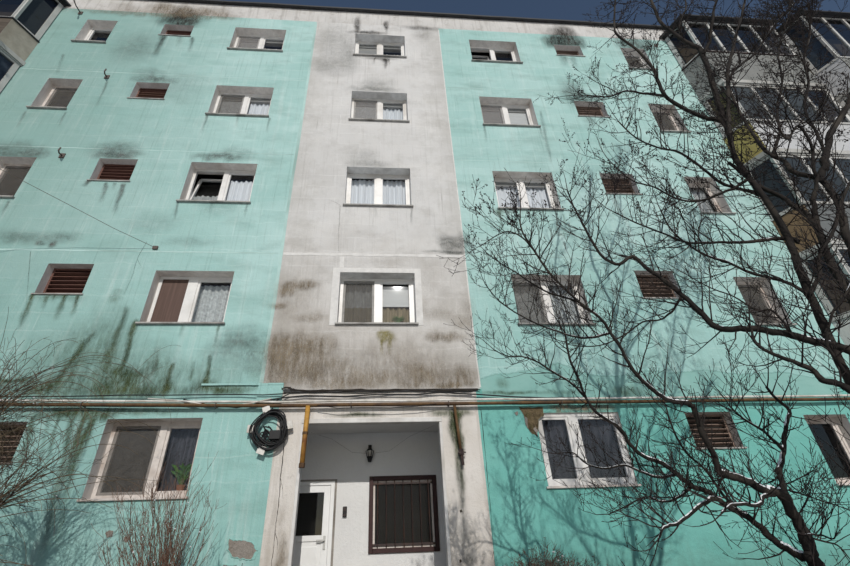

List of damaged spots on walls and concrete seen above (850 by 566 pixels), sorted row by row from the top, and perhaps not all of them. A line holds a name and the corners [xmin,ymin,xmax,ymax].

damp [280,281,314,295]
damp [106,318,136,369]
damp [268,336,332,381]
peeling [515,407,544,435]
damp [66,419,95,470]
flaking render [215,538,258,566]